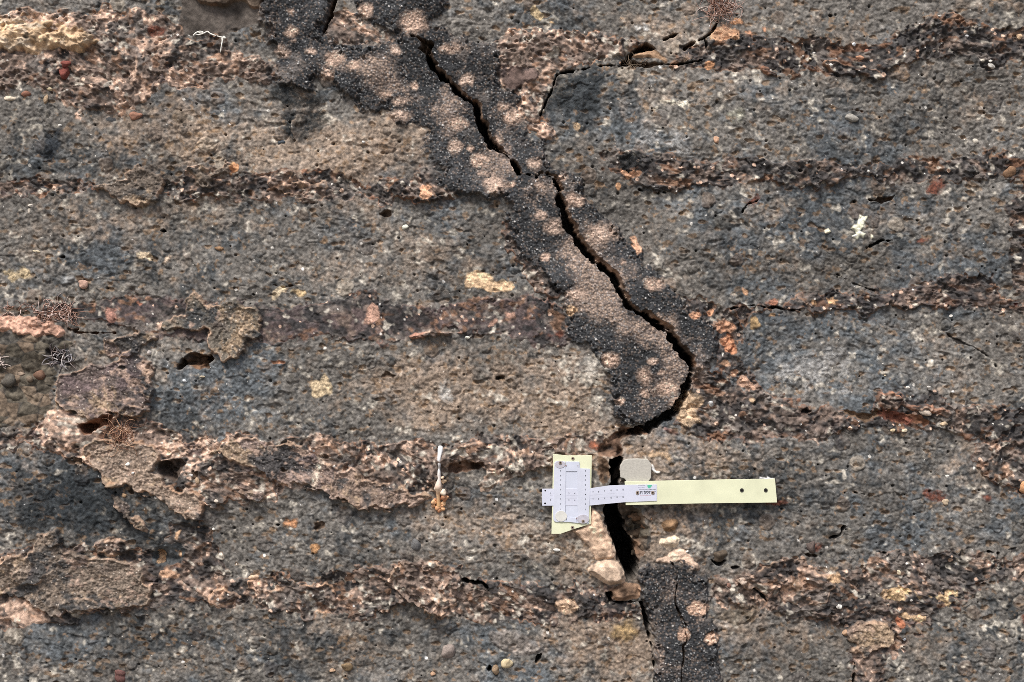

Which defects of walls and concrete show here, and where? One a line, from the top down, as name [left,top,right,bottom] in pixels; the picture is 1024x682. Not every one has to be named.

crack [539,21,720,117]
crack [410,34,698,682]
peeling [0,291,262,532]
peeling [209,433,604,513]
peeling [0,528,187,629]